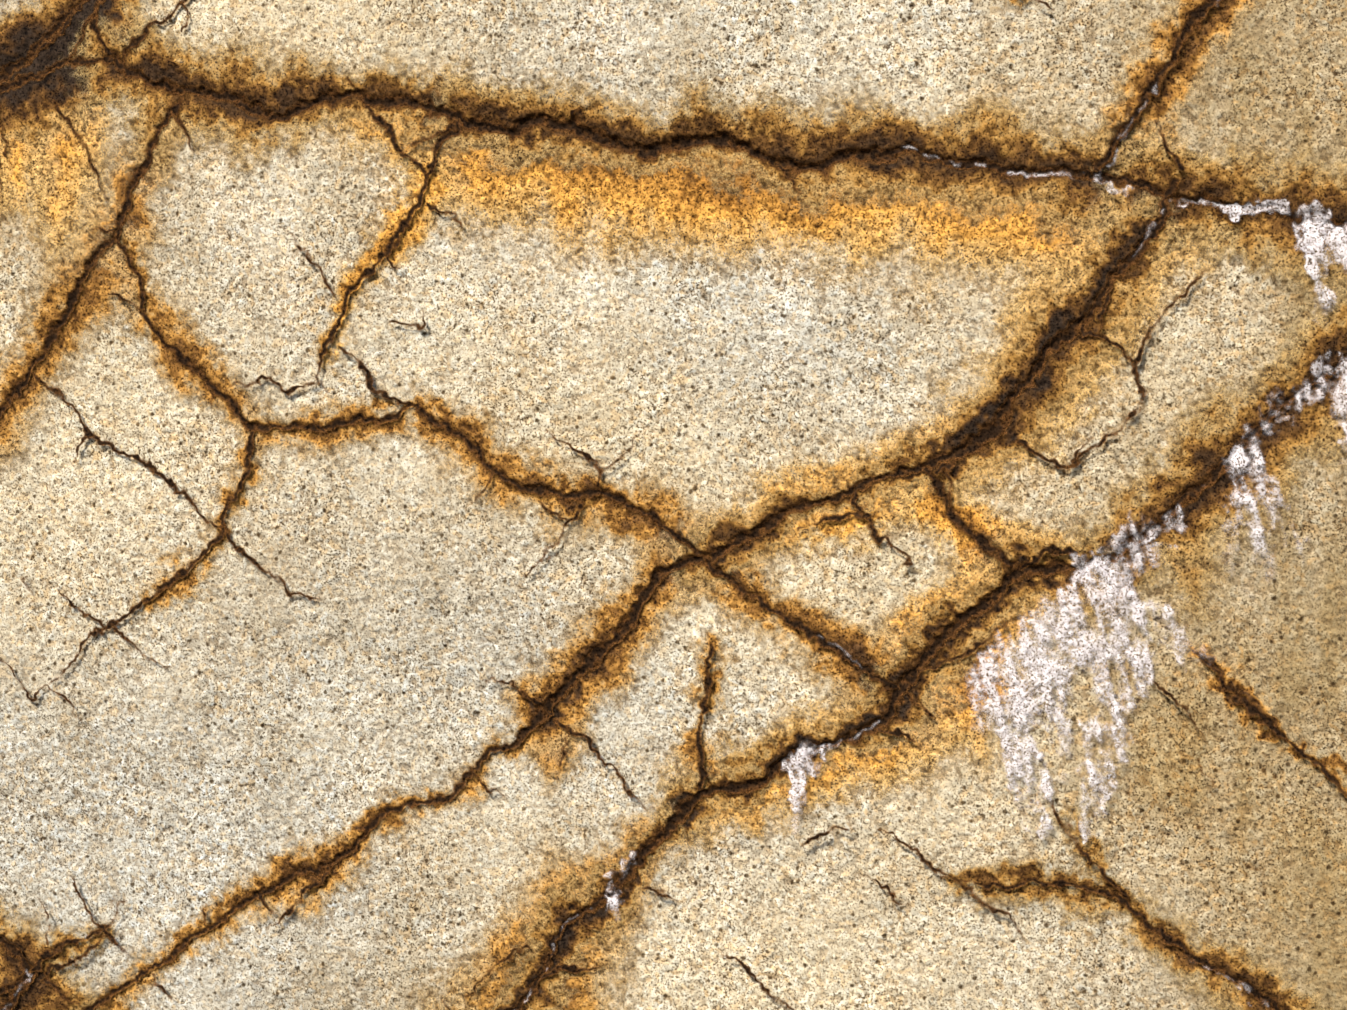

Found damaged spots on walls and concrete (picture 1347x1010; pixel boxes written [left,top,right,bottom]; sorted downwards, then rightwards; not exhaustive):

rust [0,0,1205,251]
crack [0,0,1221,397]
rust [1101,0,1347,223]
damp [1220,200,1347,303]
crack [0,98,321,675]
rust [0,61,1347,849]
crack [83,178,1347,1010]
damp [782,743,825,812]
damp [968,524,1174,843]
damp [1228,446,1281,548]
crack [0,876,127,1010]
rust [424,797,668,1010]